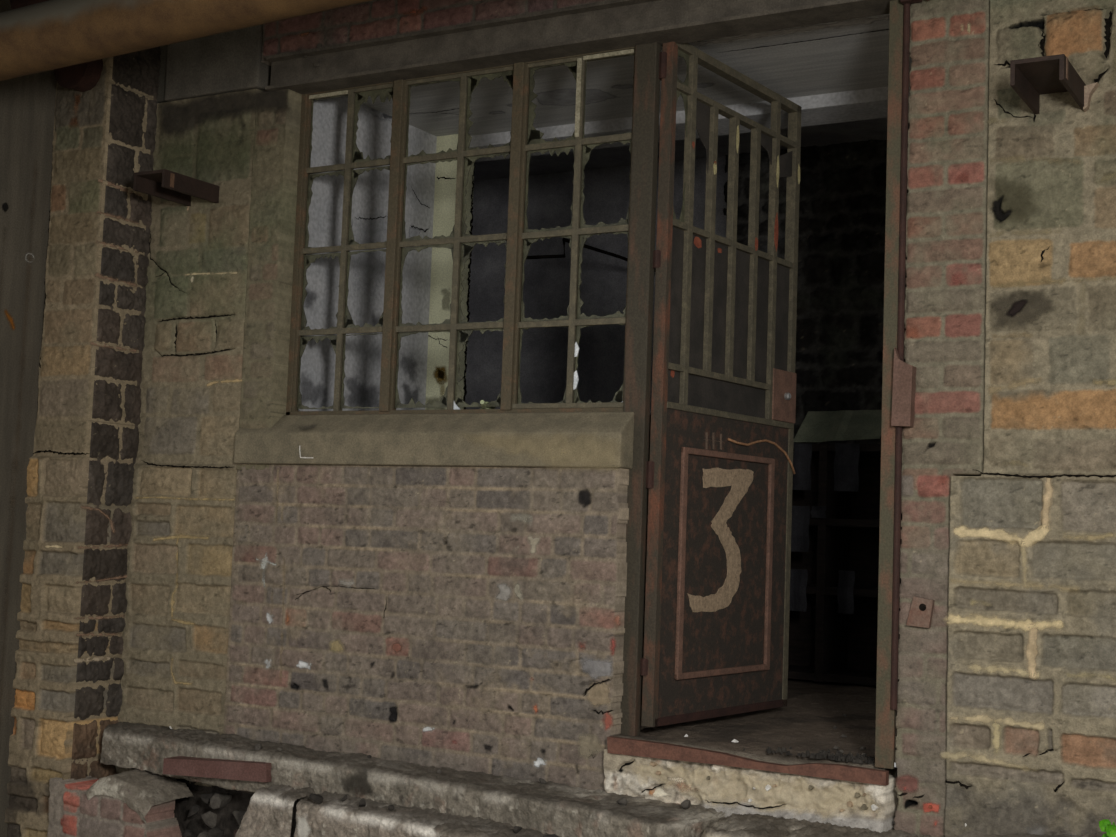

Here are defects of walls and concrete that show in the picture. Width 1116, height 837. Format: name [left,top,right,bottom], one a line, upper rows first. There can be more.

crack [148,231,185,293]